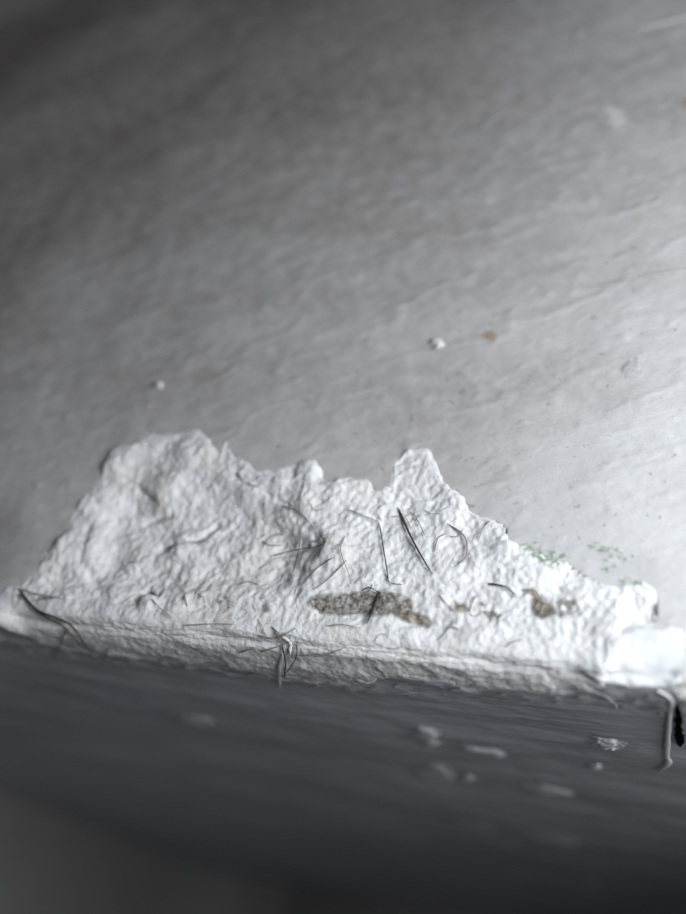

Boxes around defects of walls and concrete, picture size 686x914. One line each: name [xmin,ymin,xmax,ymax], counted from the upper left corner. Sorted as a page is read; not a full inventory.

flaking render [0,430,686,721]